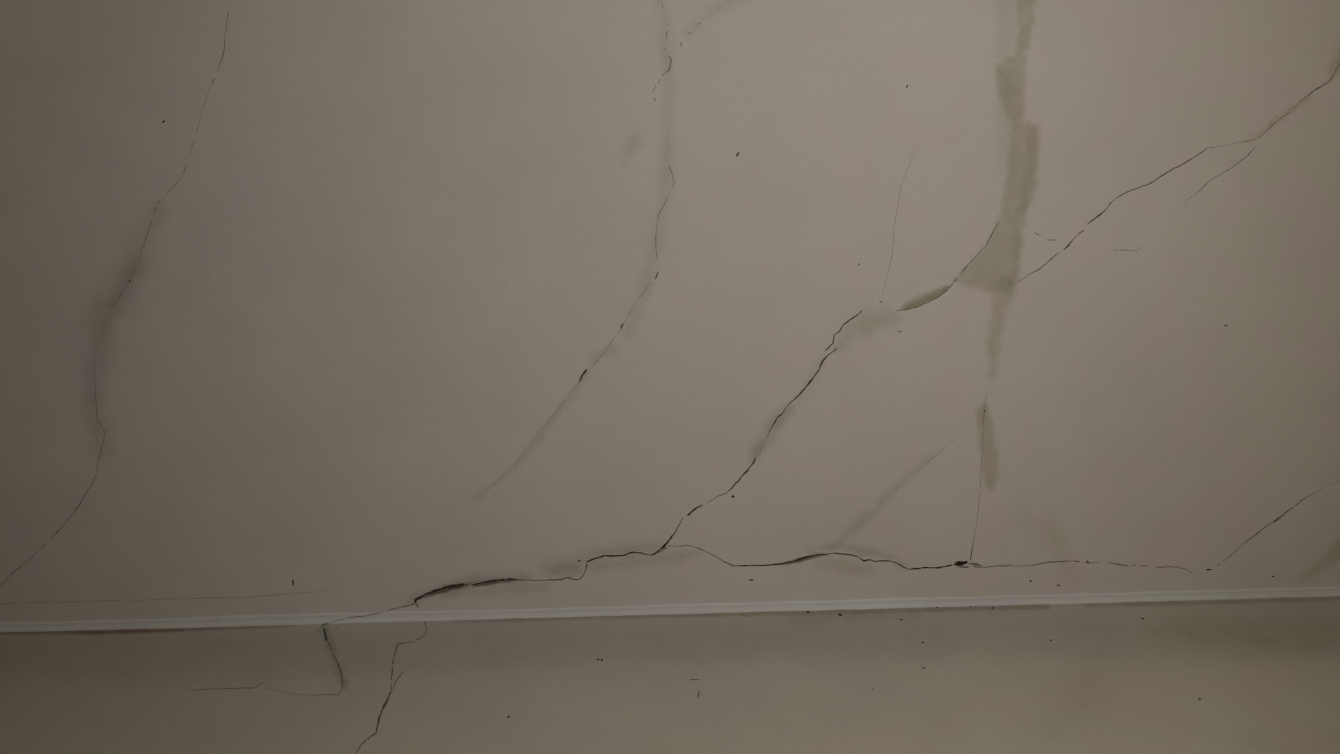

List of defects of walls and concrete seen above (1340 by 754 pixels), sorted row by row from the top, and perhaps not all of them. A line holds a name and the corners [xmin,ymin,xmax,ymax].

crack [653,4,700,101]
crack [1020,64,1340,281]
crack [0,369,114,604]
crack [192,152,1336,753]